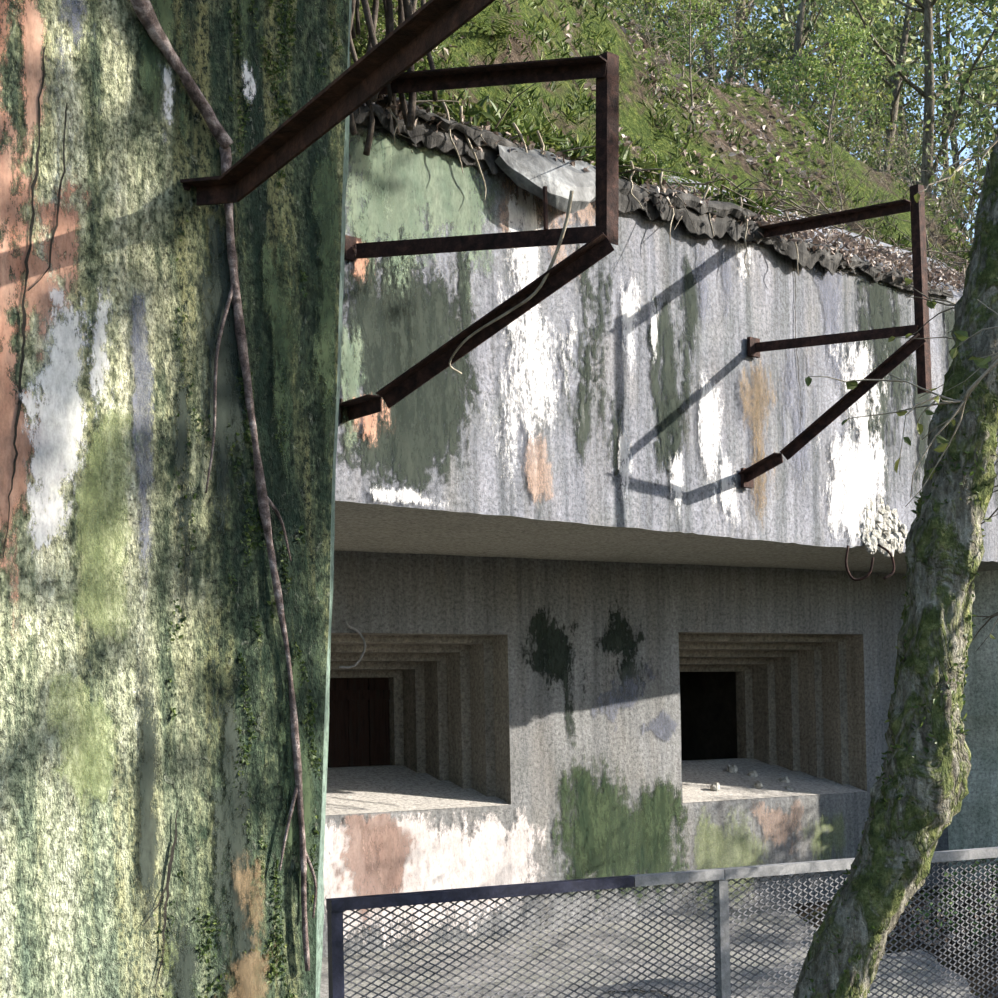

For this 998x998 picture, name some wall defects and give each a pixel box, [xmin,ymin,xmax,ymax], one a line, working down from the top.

crack [3,47,68,558]
rust [0,0,88,602]
damp [261,126,541,506]
damp [722,242,751,314]
damp [504,246,738,519]
rust [740,359,776,465]
rust [754,471,769,518]
damp [783,354,816,440]
damp [792,443,810,487]
damp [520,600,659,744]
damp [640,711,677,741]